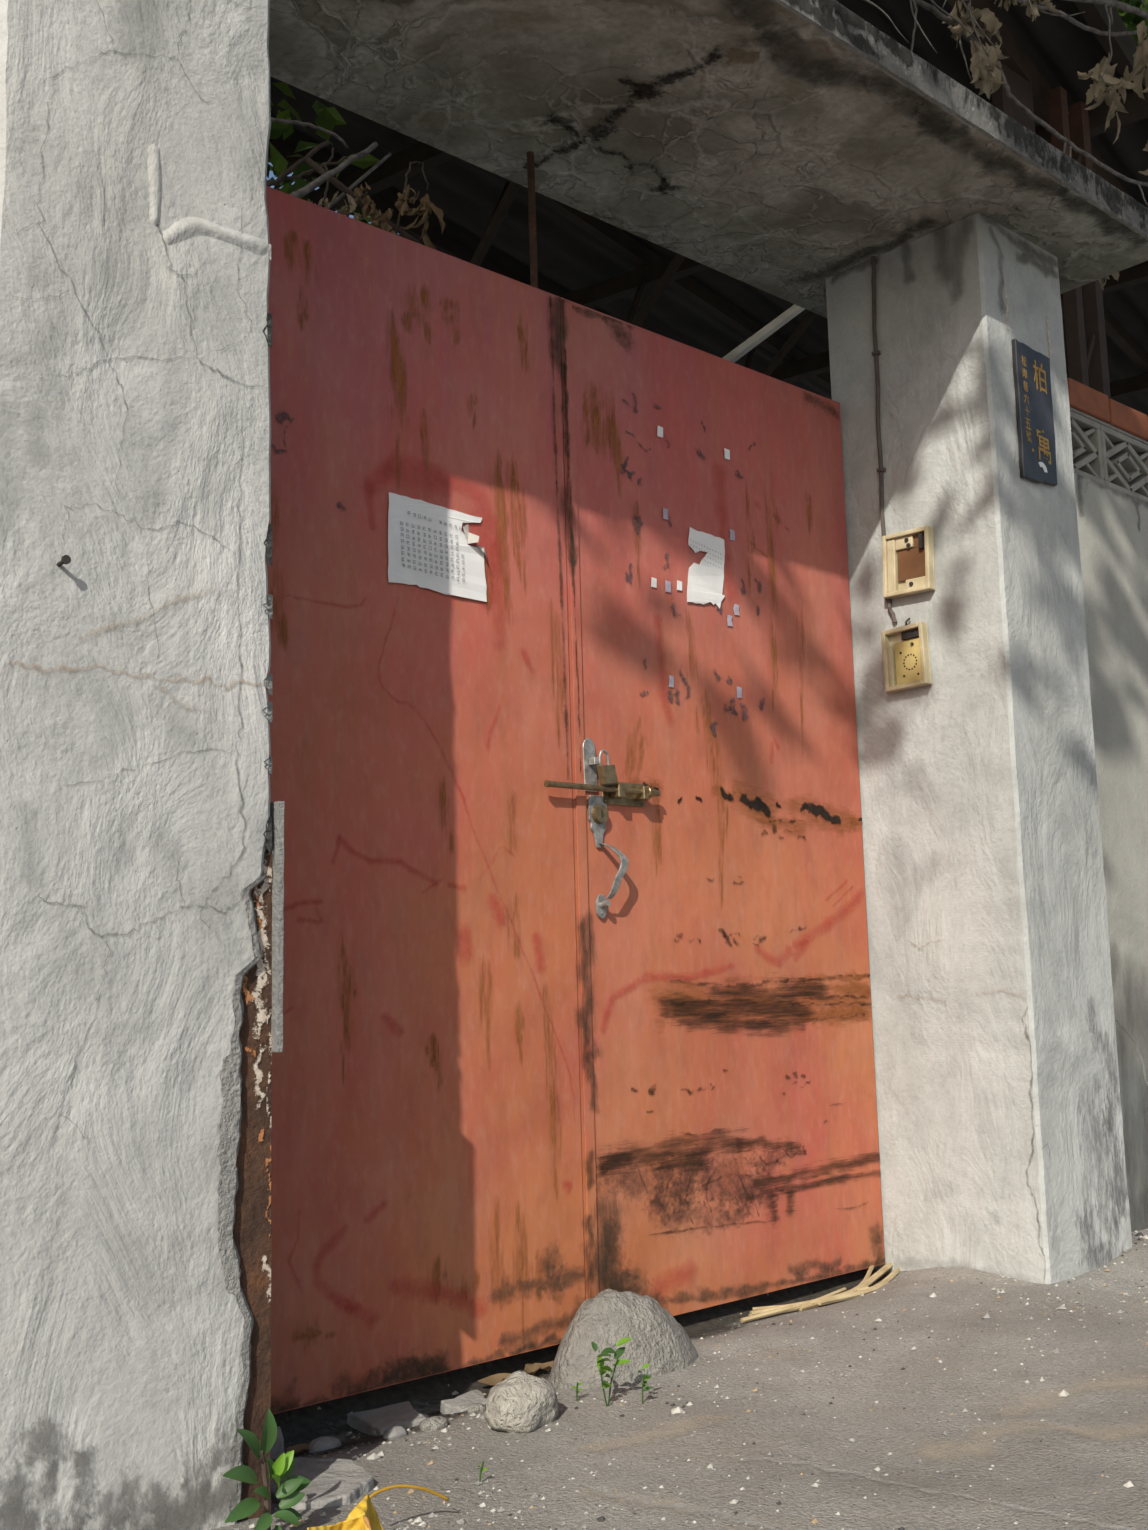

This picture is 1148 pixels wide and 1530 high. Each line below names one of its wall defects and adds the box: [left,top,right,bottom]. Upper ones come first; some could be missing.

leakage [523,45,721,194]
leakage [729,0,1145,297]
corrosion [391,288,430,405]
corrosion [484,463,526,605]
corrosion [551,520,581,770]
corrosion [659,975,869,1031]
spalling [0,801,285,1530]
corrosion [599,1129,880,1224]
leakage [1116,987,1148,1232]
corrosion [604,1234,885,1302]
leakage [136,1478,237,1530]